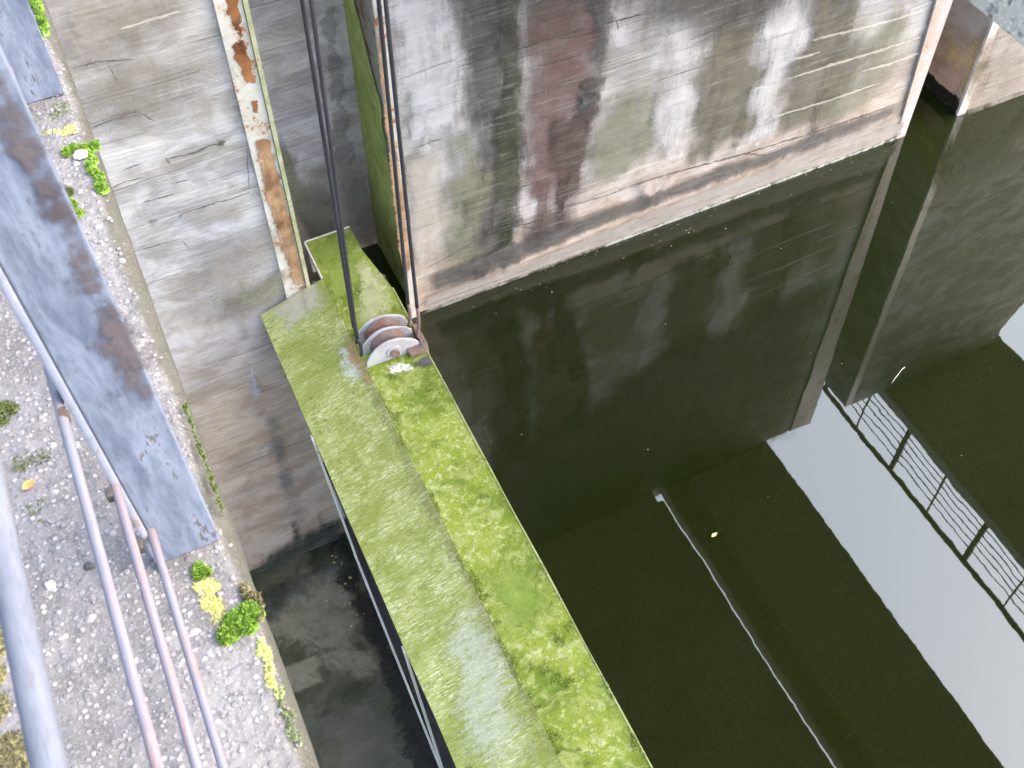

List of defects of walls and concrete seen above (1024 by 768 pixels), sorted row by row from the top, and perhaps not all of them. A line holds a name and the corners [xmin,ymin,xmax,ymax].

corrosion [226,0,256,83]
corrosion [0,78,102,294]
crack [91,112,154,129]
crack [112,143,249,252]
corrosion [256,139,304,285]
damp [388,0,903,310]
corrosion [94,304,152,399]